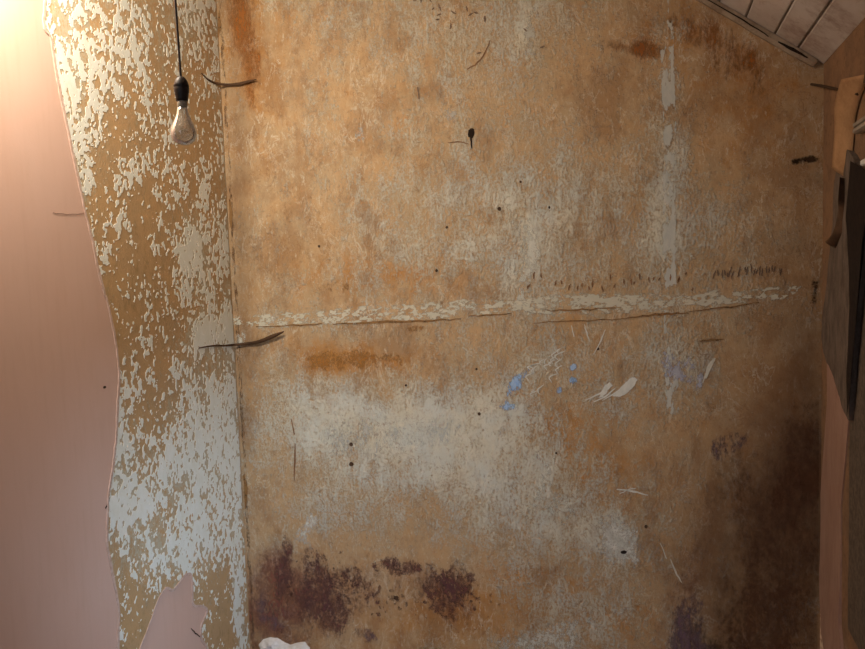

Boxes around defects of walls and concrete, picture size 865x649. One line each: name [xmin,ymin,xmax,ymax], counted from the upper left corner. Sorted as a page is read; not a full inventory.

corrosion [229,0,260,103]
corrosion [616,40,660,57]
peeling [42,0,310,649]